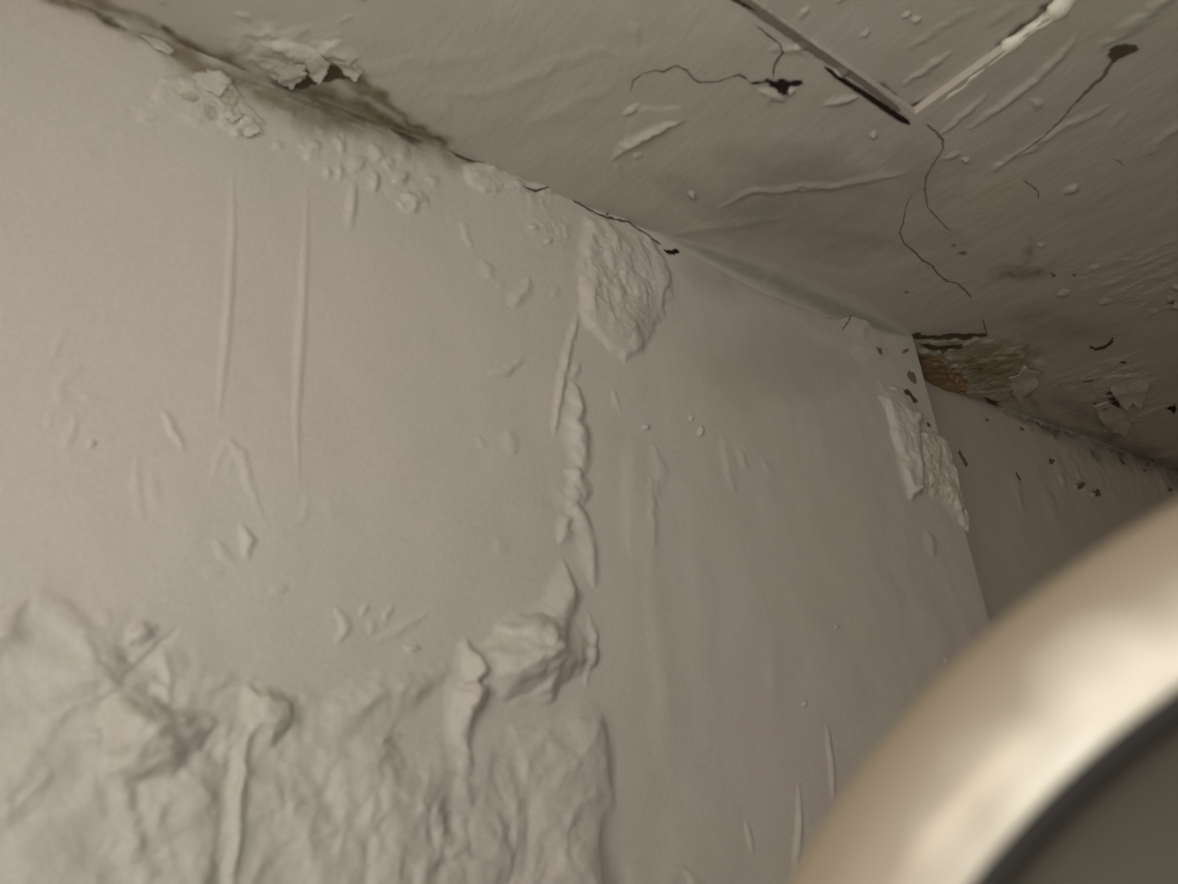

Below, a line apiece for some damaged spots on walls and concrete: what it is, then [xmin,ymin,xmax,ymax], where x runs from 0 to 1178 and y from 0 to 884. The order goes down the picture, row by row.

water stain [163,27,243,71]
peeling [79,11,373,160]
water stain [302,76,446,145]
crack [824,67,971,297]